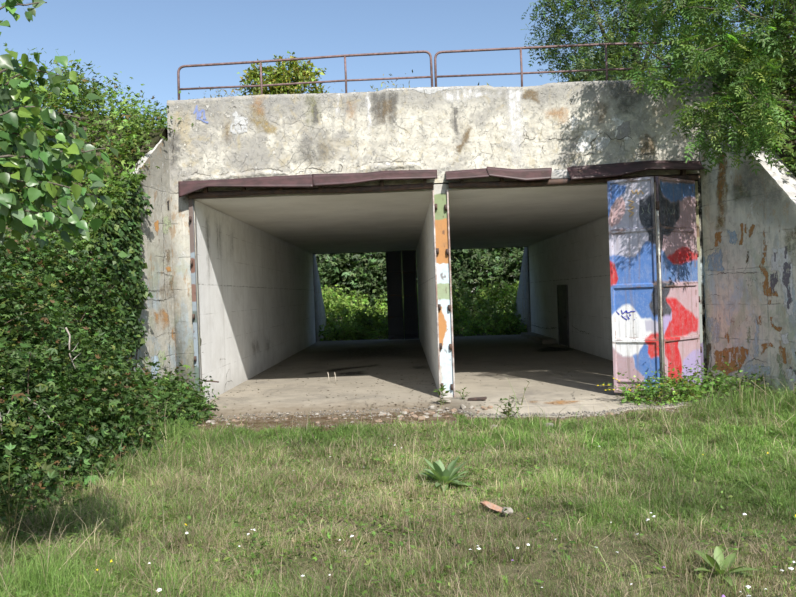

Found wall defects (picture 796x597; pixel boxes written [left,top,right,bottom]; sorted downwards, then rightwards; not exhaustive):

water stain [366,92,397,125]
crack [492,121,598,155]
corrosion [717,155,728,227]
peeling [703,223,796,316]
peeling [705,312,796,395]